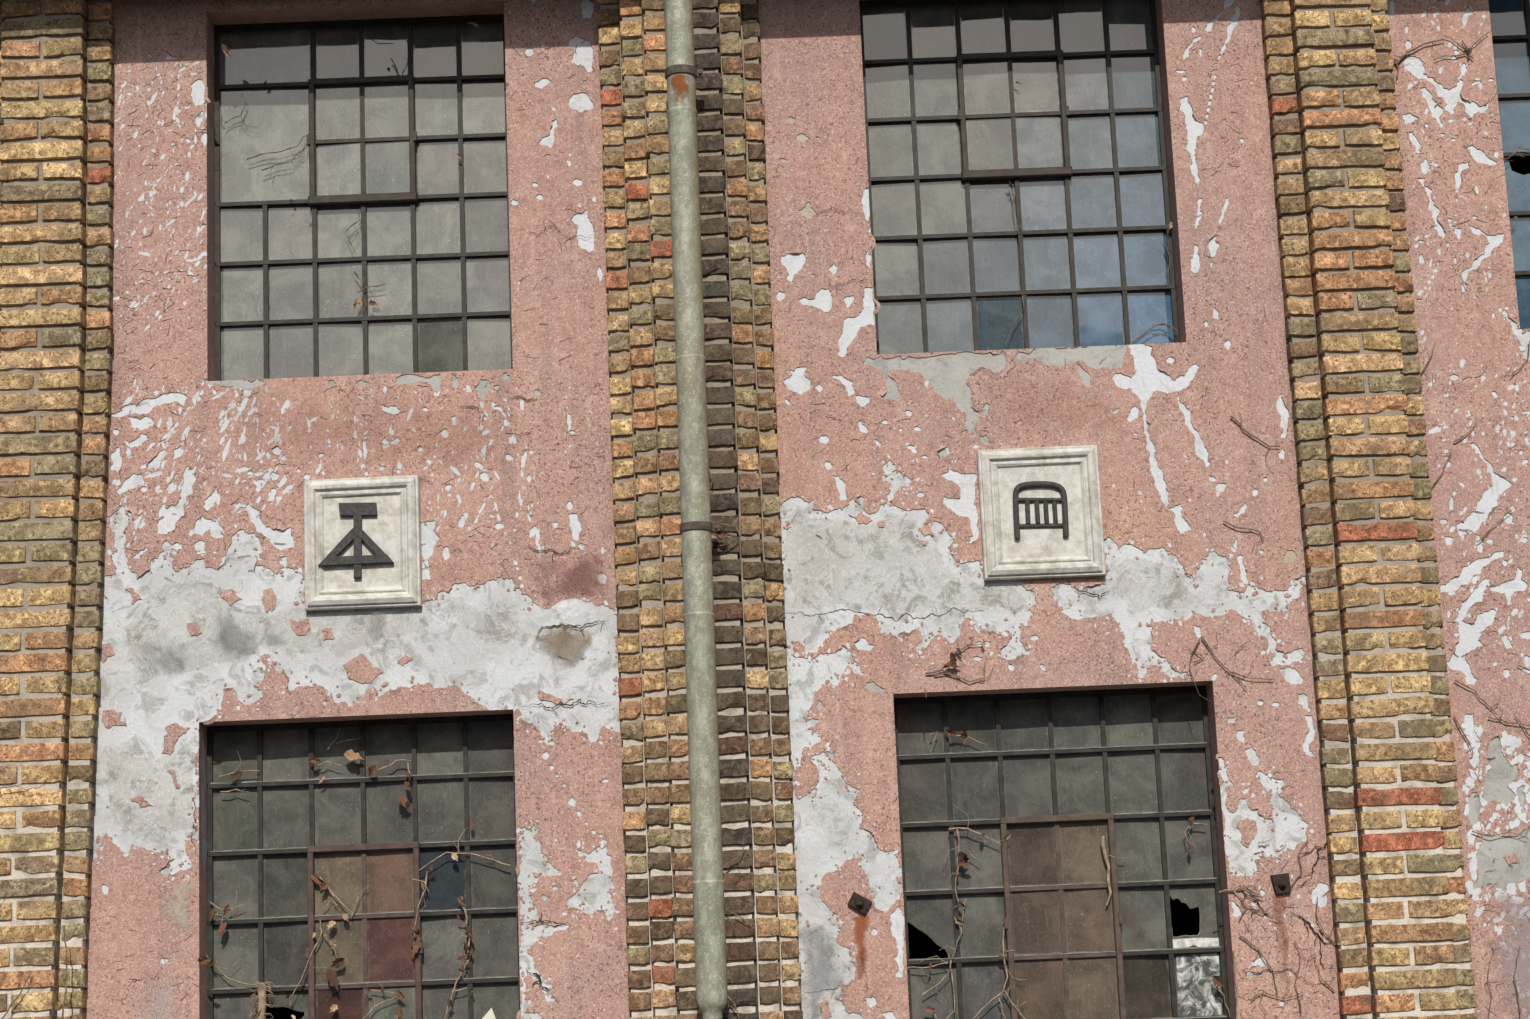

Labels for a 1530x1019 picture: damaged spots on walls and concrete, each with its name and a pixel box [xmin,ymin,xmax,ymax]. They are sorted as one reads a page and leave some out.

peeling [861,188,876,268]
peeling [1388,0,1504,292]
peeling [204,379,269,392]
peeling [394,372,511,420]
peeling [1495,303,1530,366]
peeling [90,392,622,886]
crack [785,607,981,621]
peeling [776,248,1316,1019]
peeling [1437,443,1530,685]
spalling [1464,714,1530,889]
peeling [516,820,624,1019]
corrosion [856,915,867,975]